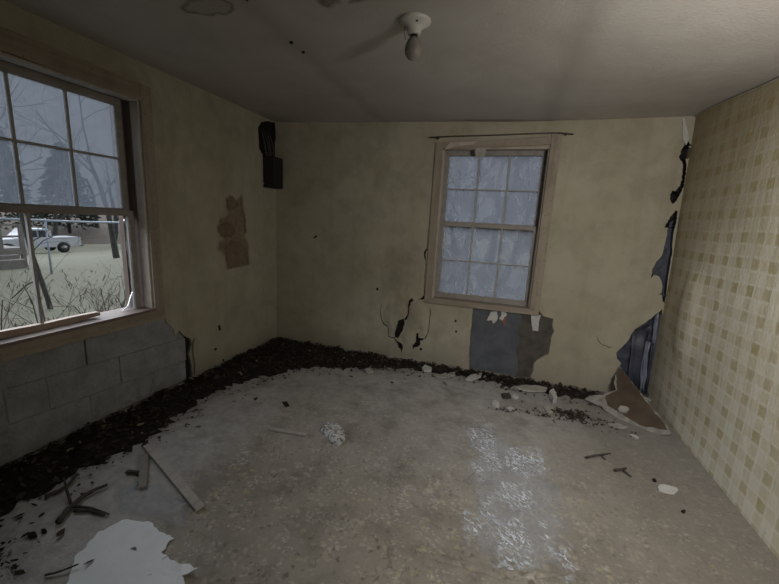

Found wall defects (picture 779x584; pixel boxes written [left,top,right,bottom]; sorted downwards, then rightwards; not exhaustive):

spalling [0,319,199,466]
crack [405,228,431,339]
spalling [469,308,554,379]
spalling [616,218,676,397]